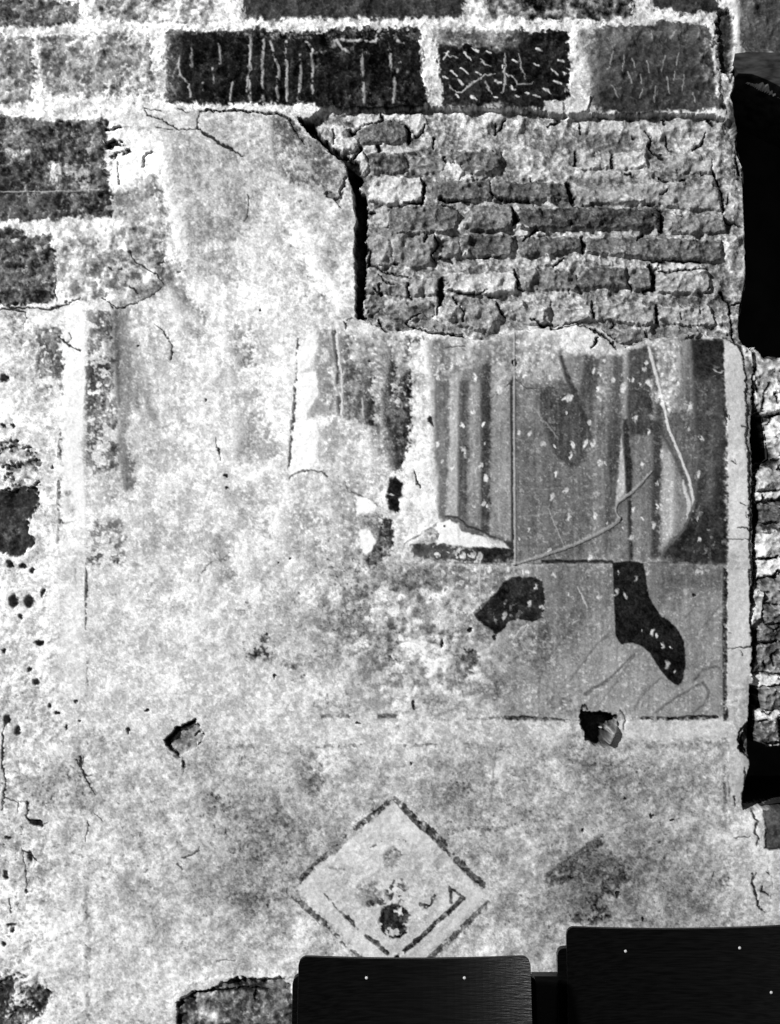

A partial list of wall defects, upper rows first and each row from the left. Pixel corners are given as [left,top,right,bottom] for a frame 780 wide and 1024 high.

flaking render [101,125,182,267]
crack [0,249,181,362]
crack [143,107,654,566]
flaking render [265,72,755,610]
flaking render [160,966,297,1024]